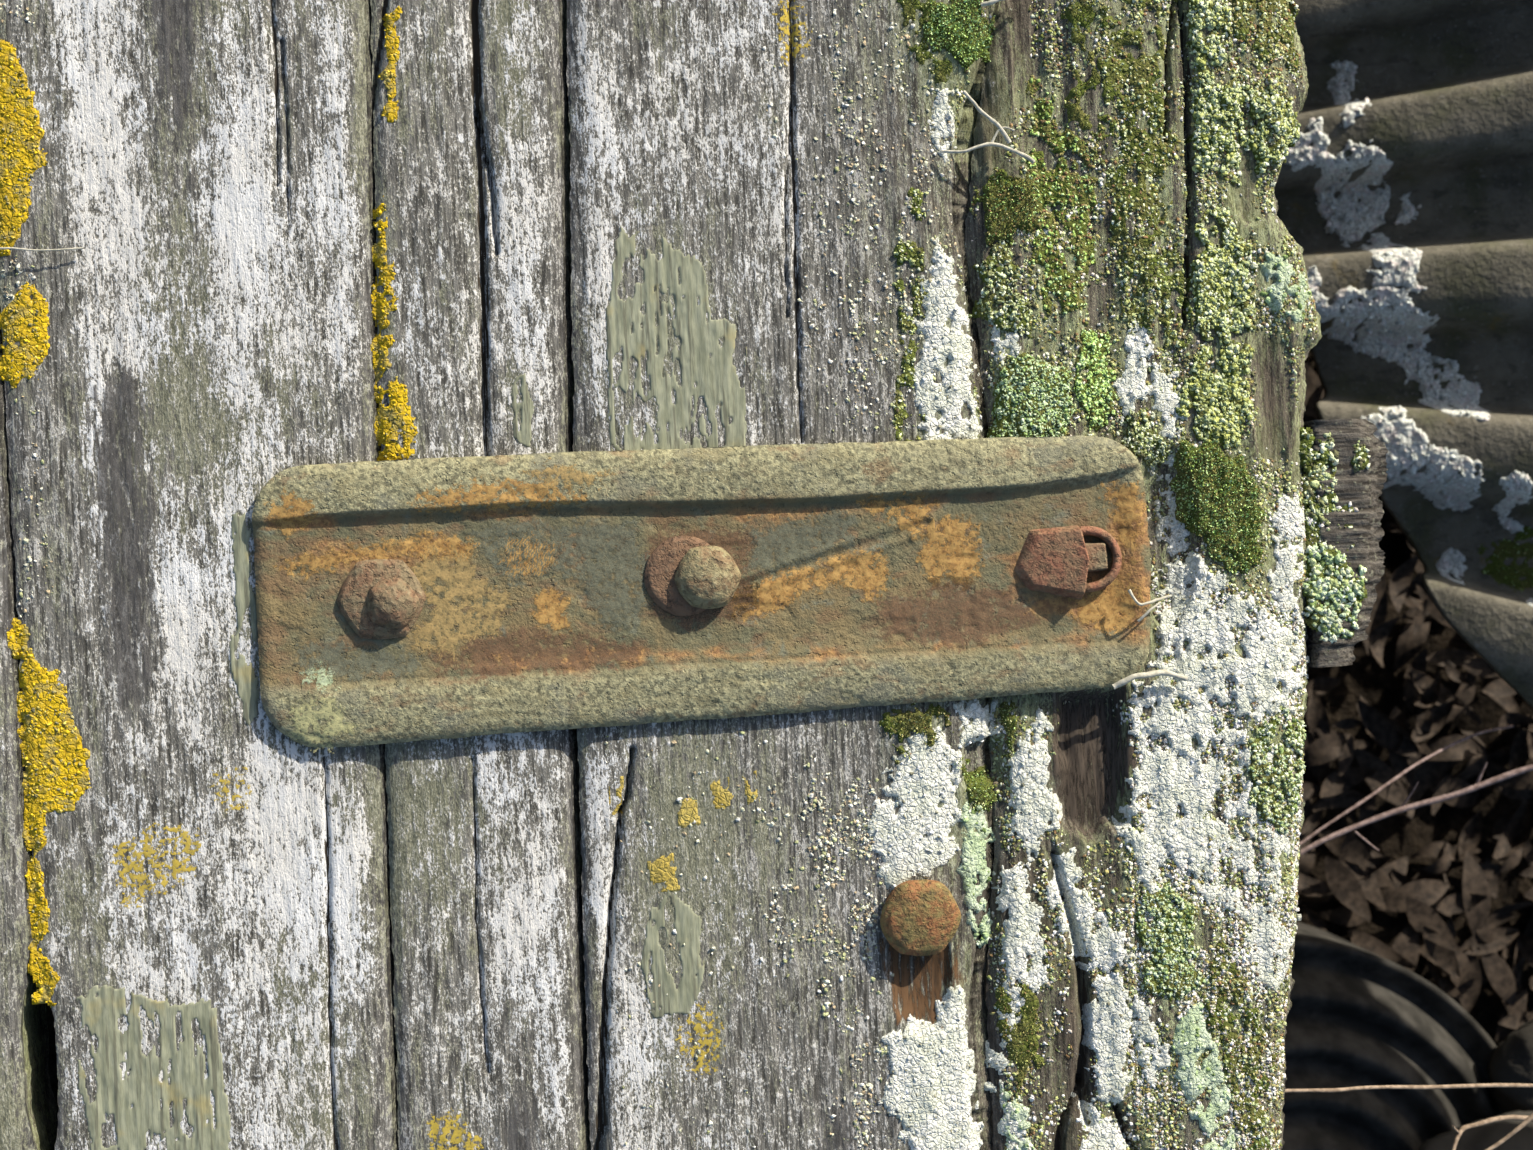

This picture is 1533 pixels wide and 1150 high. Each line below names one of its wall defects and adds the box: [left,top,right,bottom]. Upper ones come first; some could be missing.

peeling [606,225,747,451]
corrosion [264,457,647,685]
corrosion [645,524,895,631]
corrosion [856,491,984,591]
corrosion [1068,481,1146,635]
crack [596,749,632,1150]
corrosion [879,938,967,1029]
peeling [76,985,231,1150]